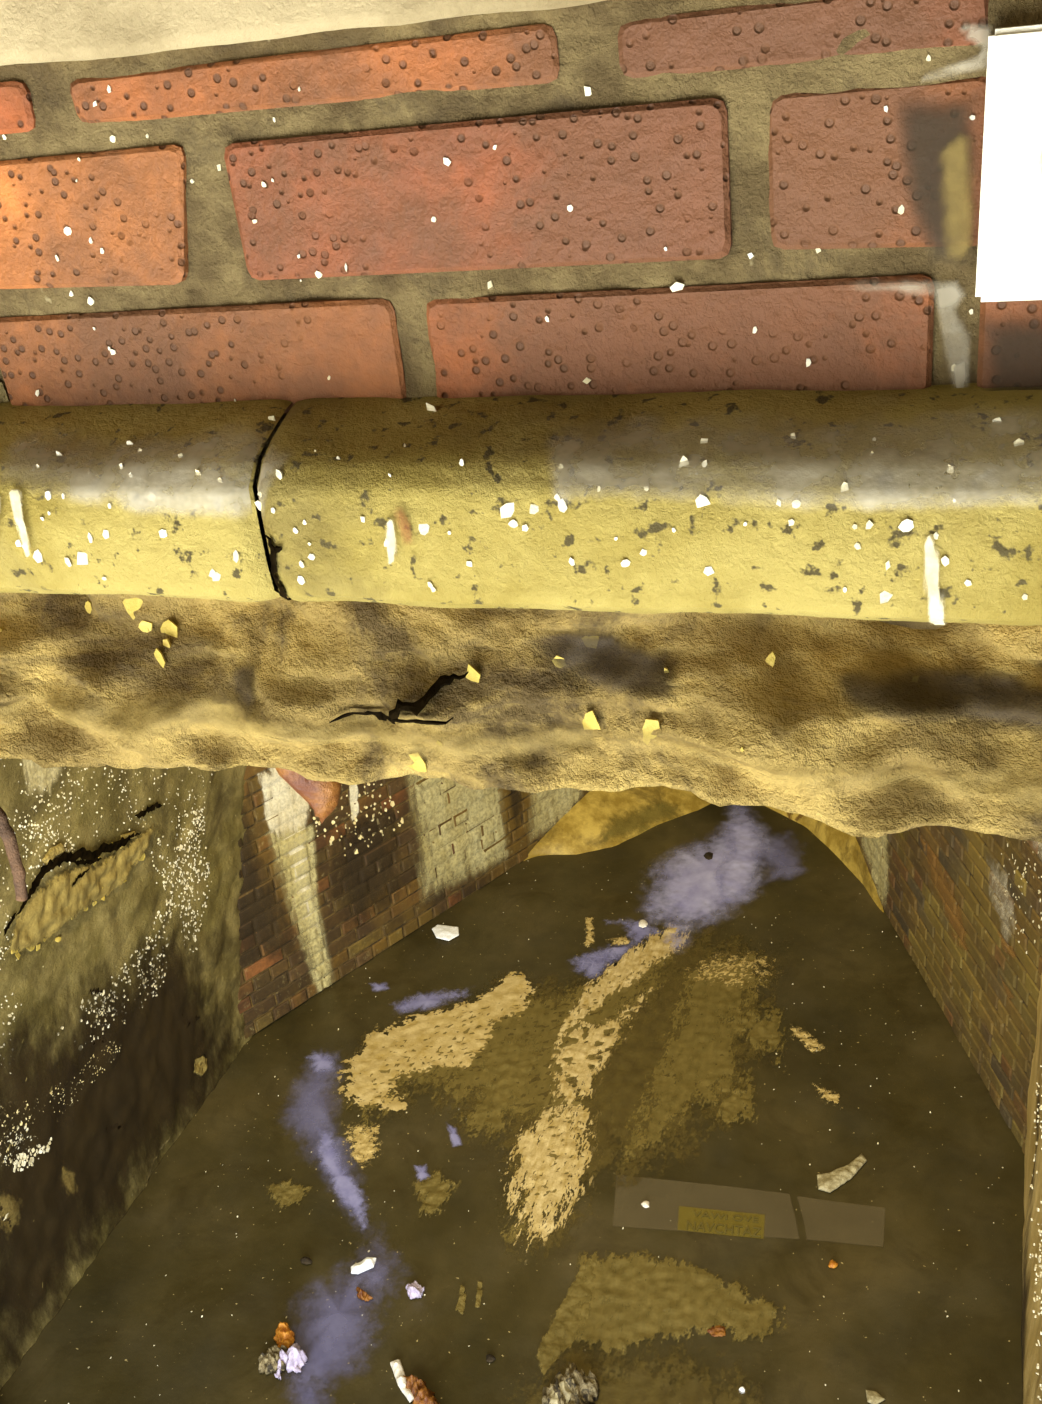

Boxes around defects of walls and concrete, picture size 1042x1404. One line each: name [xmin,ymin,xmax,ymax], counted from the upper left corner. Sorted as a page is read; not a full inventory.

crack [329,672,469,725]
leakage [23,759,59,791]
leakage [237,768,330,992]
leakage [340,785,398,914]
leakage [409,774,579,892]
spalling [0,763,212,1173]